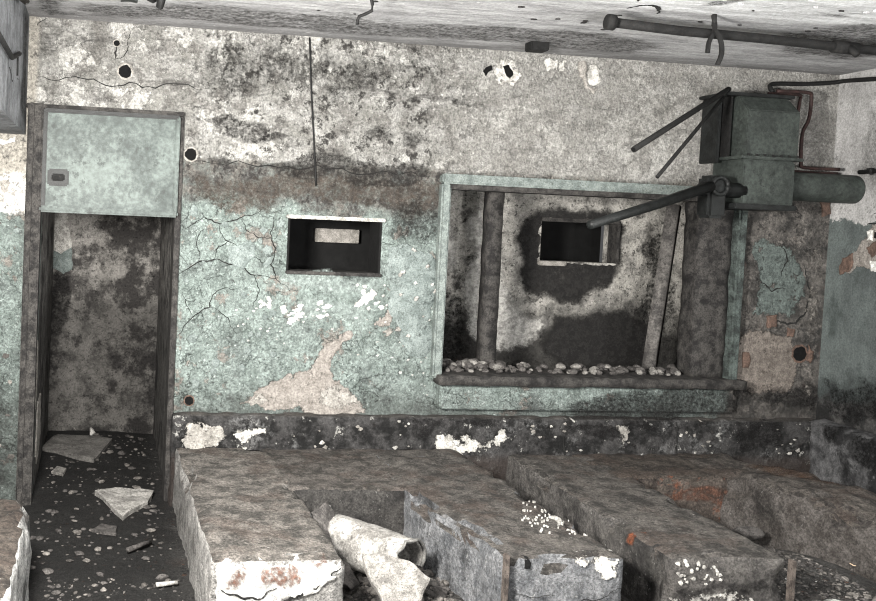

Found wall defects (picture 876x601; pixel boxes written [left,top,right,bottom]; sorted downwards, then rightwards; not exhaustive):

leakage [195,153,439,216]
crack [178,209,290,306]
flaking render [839,213,876,275]
crack [182,287,237,334]
flaking render [236,270,401,414]
leakage [541,234,661,369]
flaking render [737,241,821,396]
peeling [609,417,636,449]
leakage [823,378,876,442]
rust [227,567,246,589]
crack [220,568,341,601]
rust [261,564,301,588]